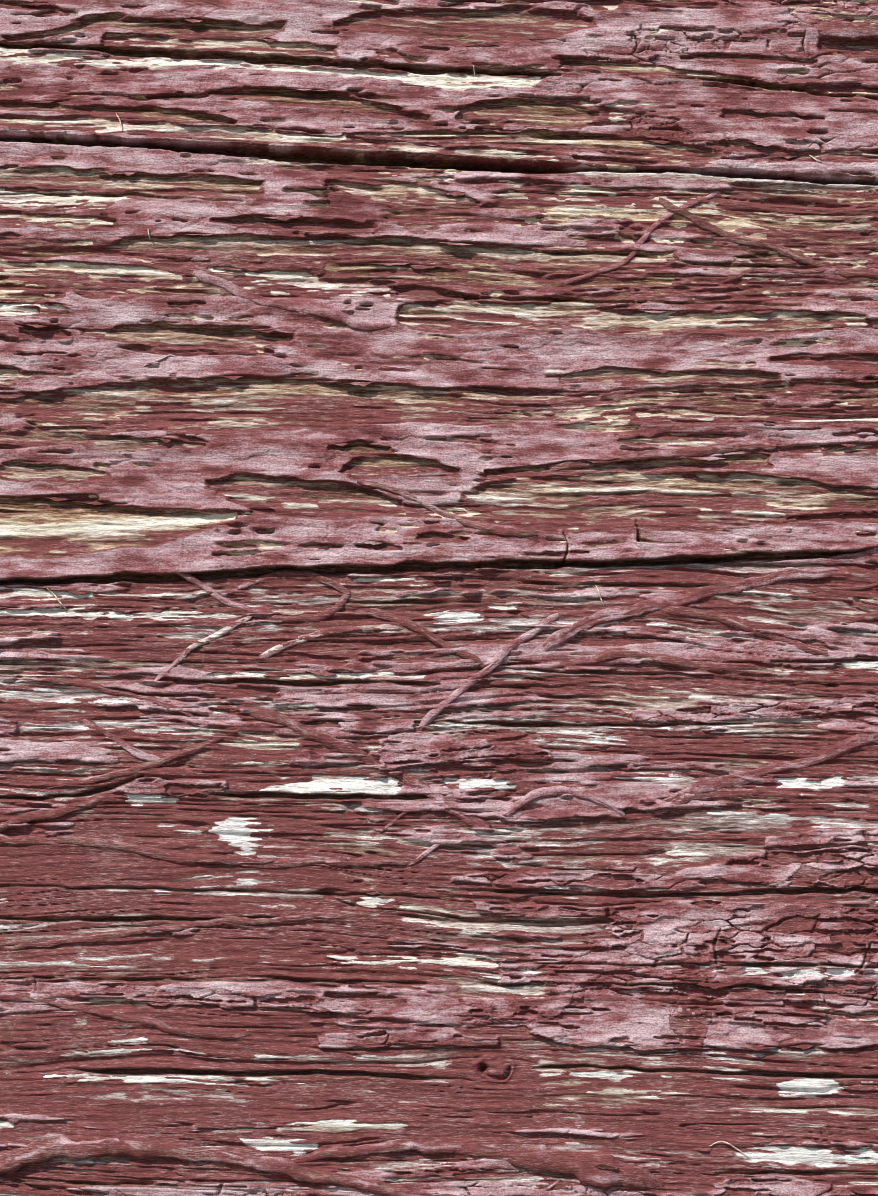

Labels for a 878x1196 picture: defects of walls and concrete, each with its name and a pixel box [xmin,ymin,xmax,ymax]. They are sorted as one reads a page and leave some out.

peeling [0,14,878,171]
crack [671,76,878,100]
peeling [0,216,866,335]
peeling [0,355,878,451]
peeling [0,442,459,557]
peeling [464,454,878,532]
crack [0,520,870,605]
peeling [260,773,402,797]
crack [0,829,878,1080]
crack [0,1180,247,1188]
crack [713,1170,878,1196]
peeling [730,1143,878,1168]